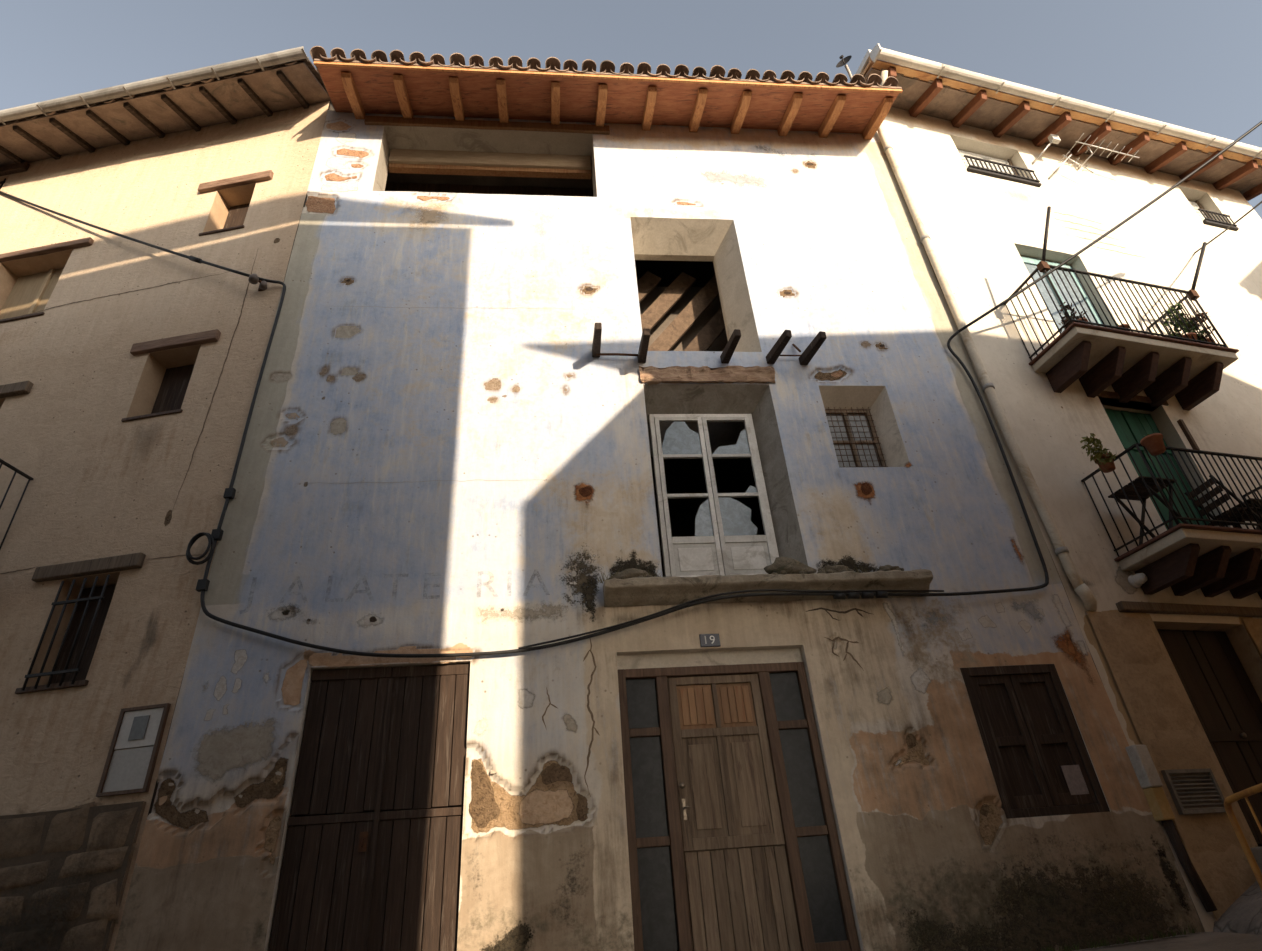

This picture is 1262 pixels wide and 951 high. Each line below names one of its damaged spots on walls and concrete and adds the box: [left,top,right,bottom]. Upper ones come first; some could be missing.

peeling [305,121,369,214]
corrosion [574,483,594,505]
corrosion [855,481,875,501]
peeling [281,646,456,706]
crack [542,687,557,727]
crack [583,630,600,797]
crack [806,608,871,671]
corrosion [1054,630,1092,682]
peeling [196,718,288,808]
flaking render [469,753,589,833]
damp [1136,834,1190,915]
damp [482,921,534,951]